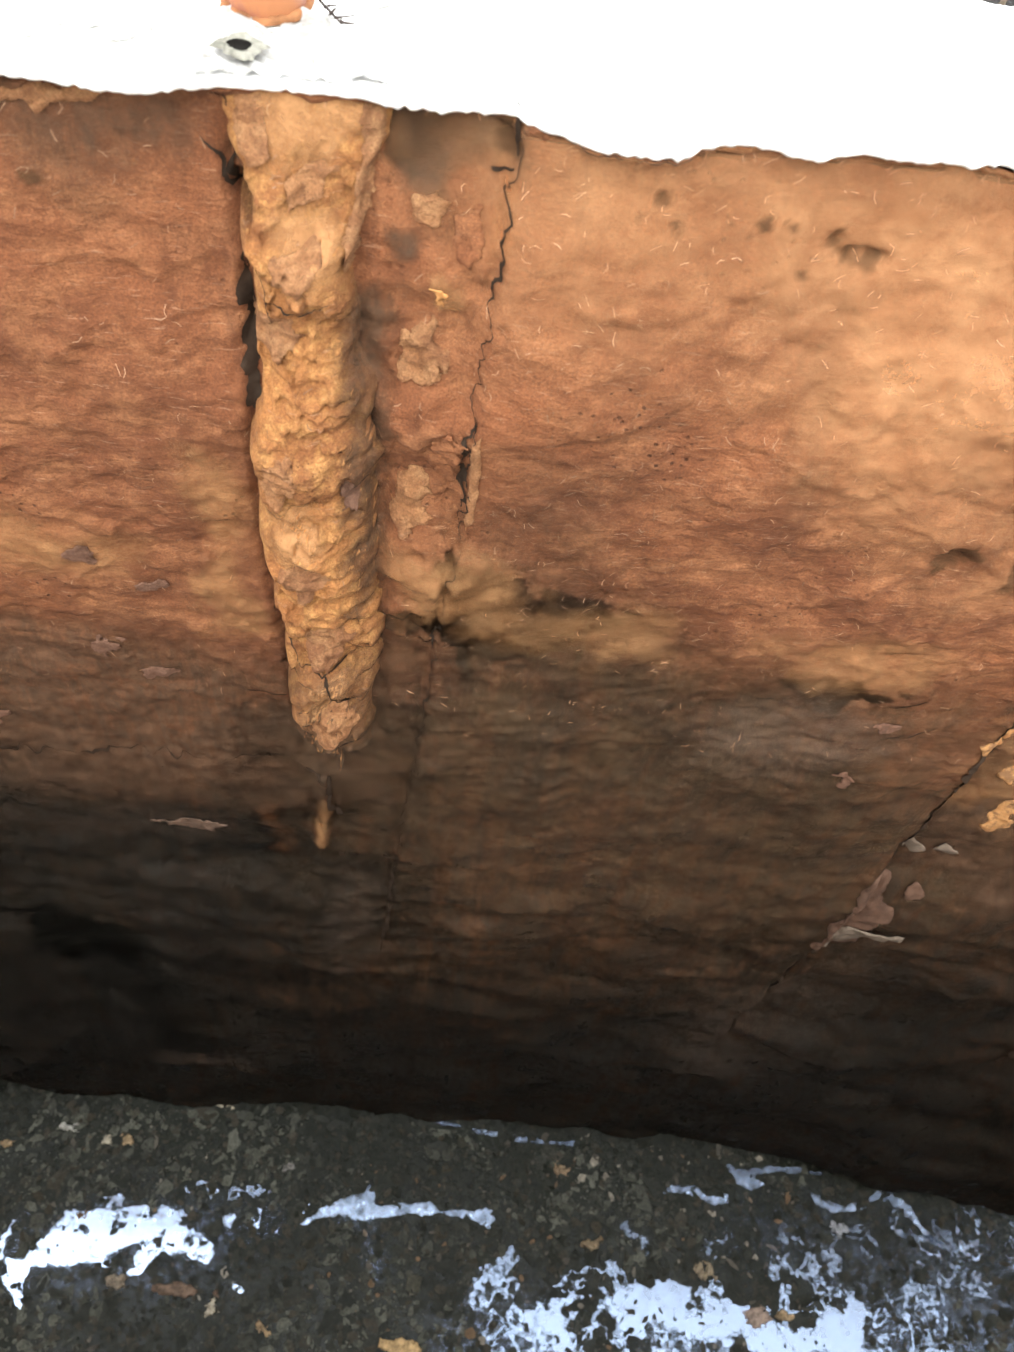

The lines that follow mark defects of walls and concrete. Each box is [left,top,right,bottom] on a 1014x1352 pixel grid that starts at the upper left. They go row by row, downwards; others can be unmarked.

crack [199,135,244,185]
crack [236,252,332,416]
crack [306,87,525,959]
crack [269,572,355,703]
crack [0,743,277,761]
peeling [832,772,855,789]
peeling [873,723,901,734]
crack [871,724,1014,890]
peeling [979,766,1014,832]
peeling [980,729,1014,757]
peeling [902,837,958,854]
peeling [810,868,924,950]